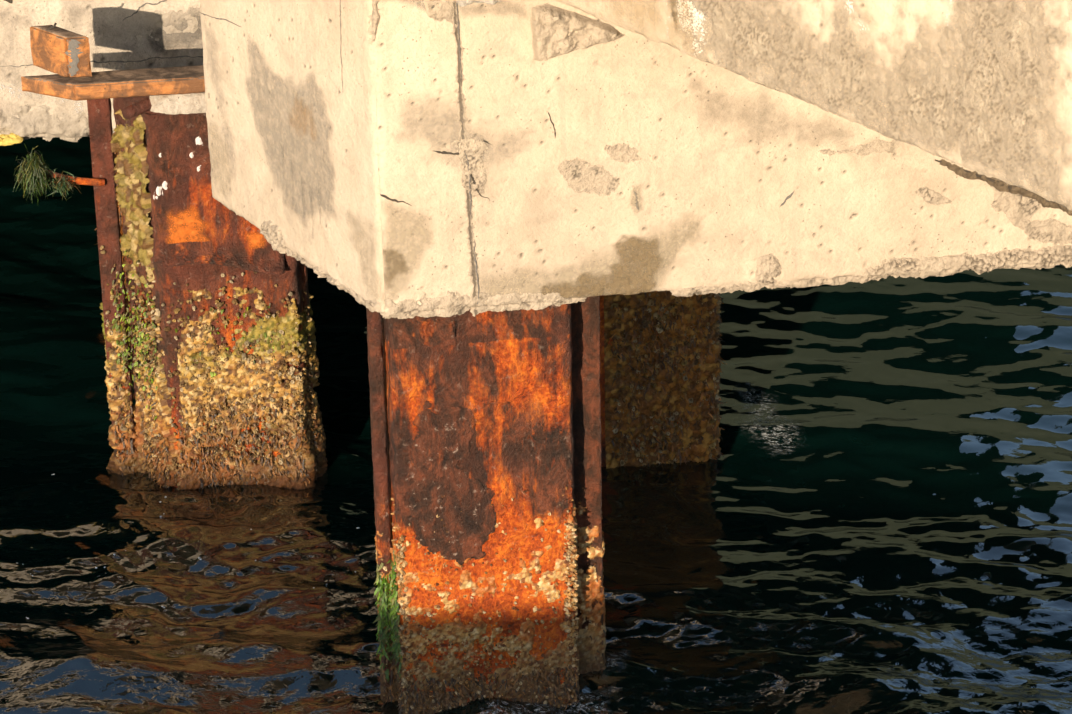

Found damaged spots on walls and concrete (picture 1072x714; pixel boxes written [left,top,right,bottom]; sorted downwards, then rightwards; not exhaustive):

crack [123,0,167,20]
spalling [531,3,624,61]
leakage [615,0,711,59]
spalling [670,159,1072,297]